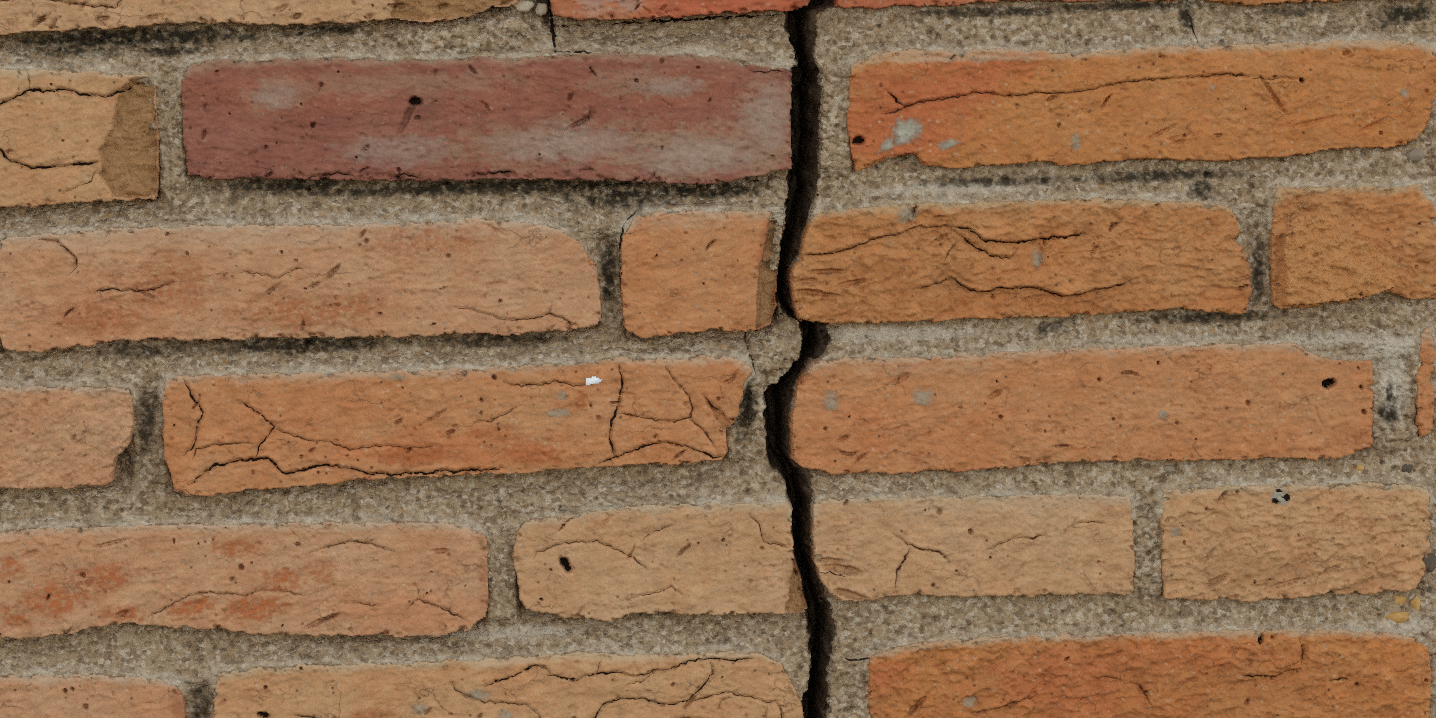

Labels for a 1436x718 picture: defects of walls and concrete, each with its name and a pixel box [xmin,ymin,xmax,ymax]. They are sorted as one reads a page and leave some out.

crack [454,0,1125,718]
crack [151,590,301,615]
crack [409,587,463,619]